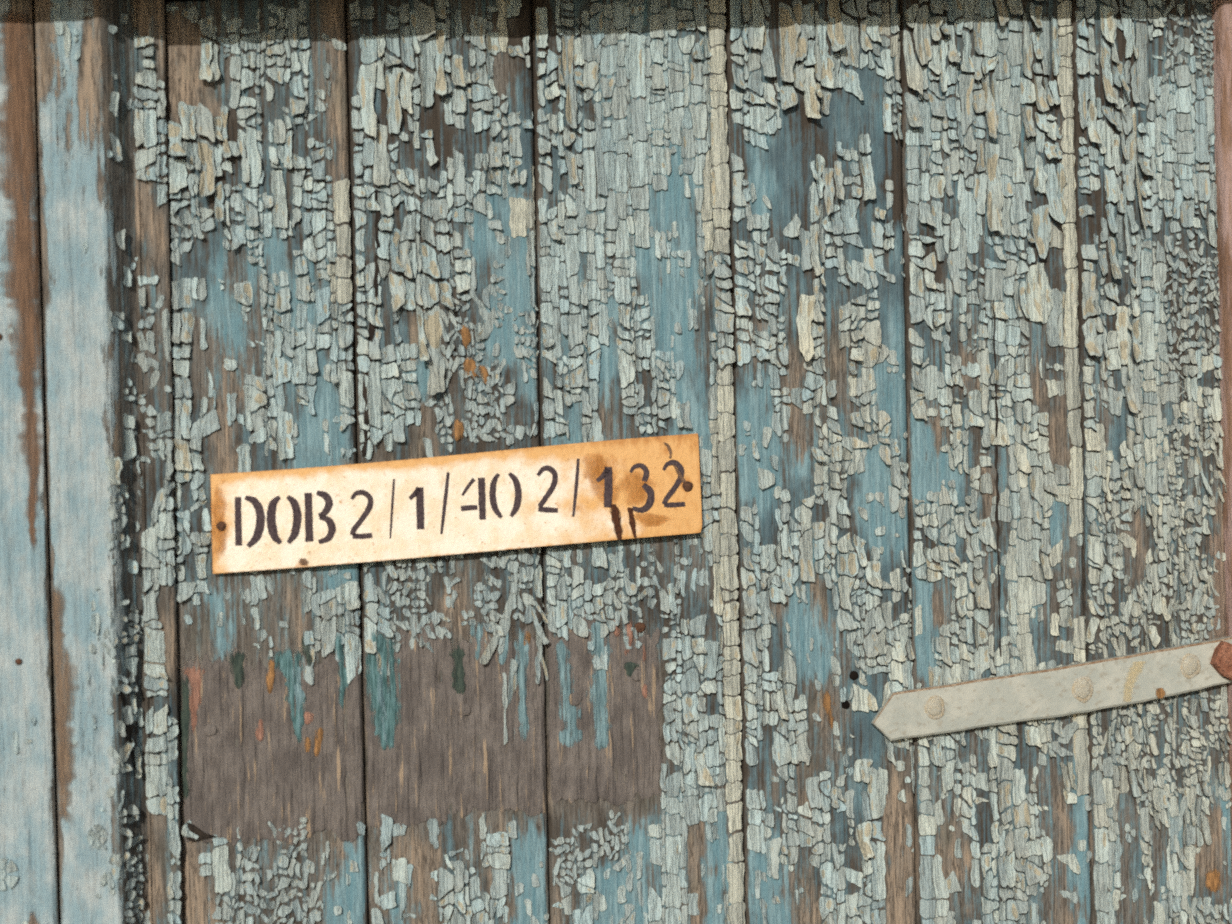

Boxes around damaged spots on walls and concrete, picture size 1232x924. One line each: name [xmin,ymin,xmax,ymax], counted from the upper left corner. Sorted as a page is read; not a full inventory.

peeling [54,2,89,78]
peeling [108,13,128,34]
peeling [109,91,119,117]
peeling [107,133,122,162]
peeling [116,229,126,250]
peeling [127,0,355,473]
corrosion [461,326,489,384]
corrosion [454,419,464,441]
peeling [349,0,1232,924]
corrosion [588,462,664,540]
peeling [87,257,337,924]
peeling [288,554,463,685]